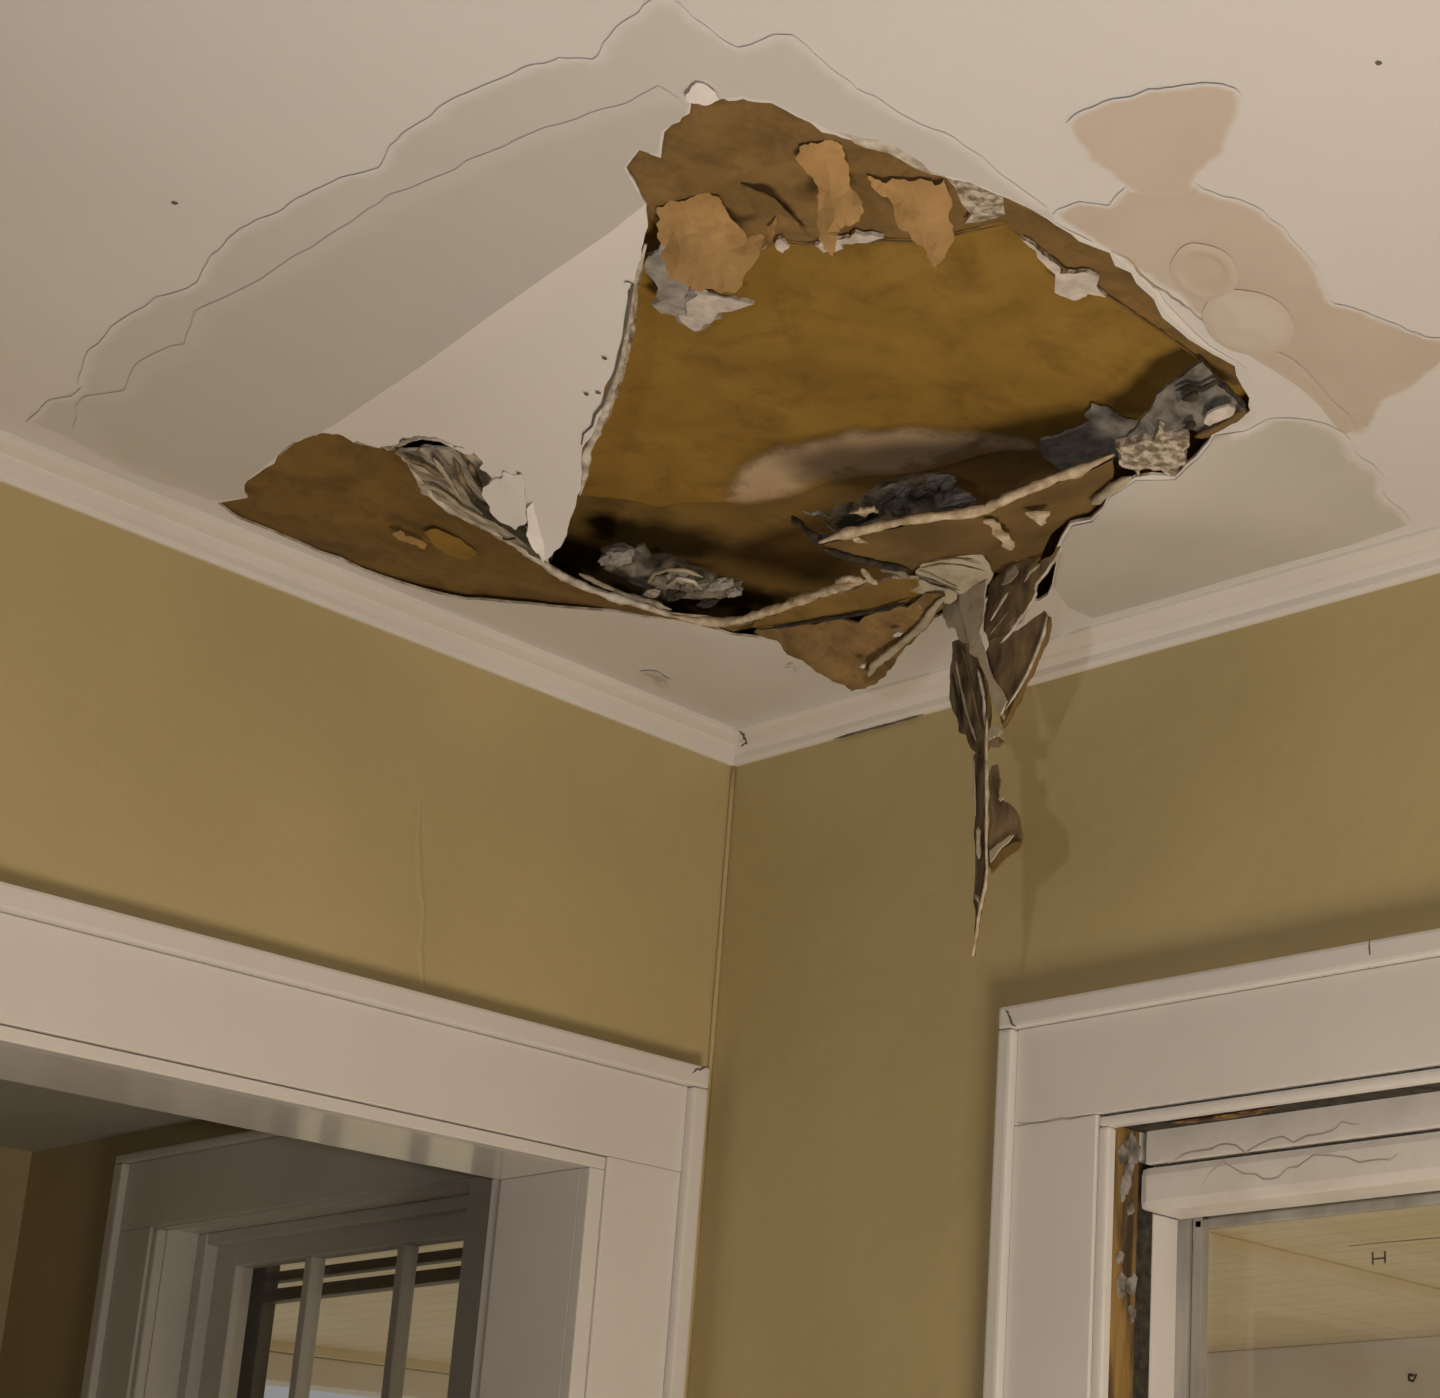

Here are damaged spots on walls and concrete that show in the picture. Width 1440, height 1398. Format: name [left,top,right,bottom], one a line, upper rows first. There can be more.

peeling [686,82,719,106]
peeling [775,234,790,253]
peeling [815,229,884,253]
peeling [1021,235,1107,301]
leakage [27,0,1440,618]
peeling [1184,404,1235,430]
peeling [221,433,866,630]
spalling [818,453,1115,551]
peeling [859,596,945,677]